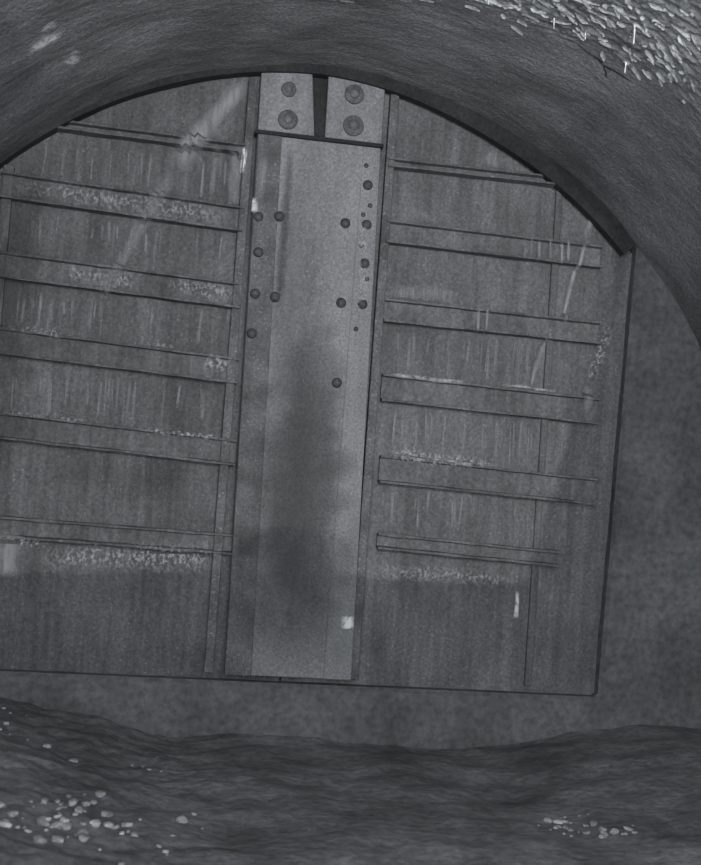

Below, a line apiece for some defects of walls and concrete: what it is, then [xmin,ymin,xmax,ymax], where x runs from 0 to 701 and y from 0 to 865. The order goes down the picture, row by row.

flaking render [465,0,700,92]